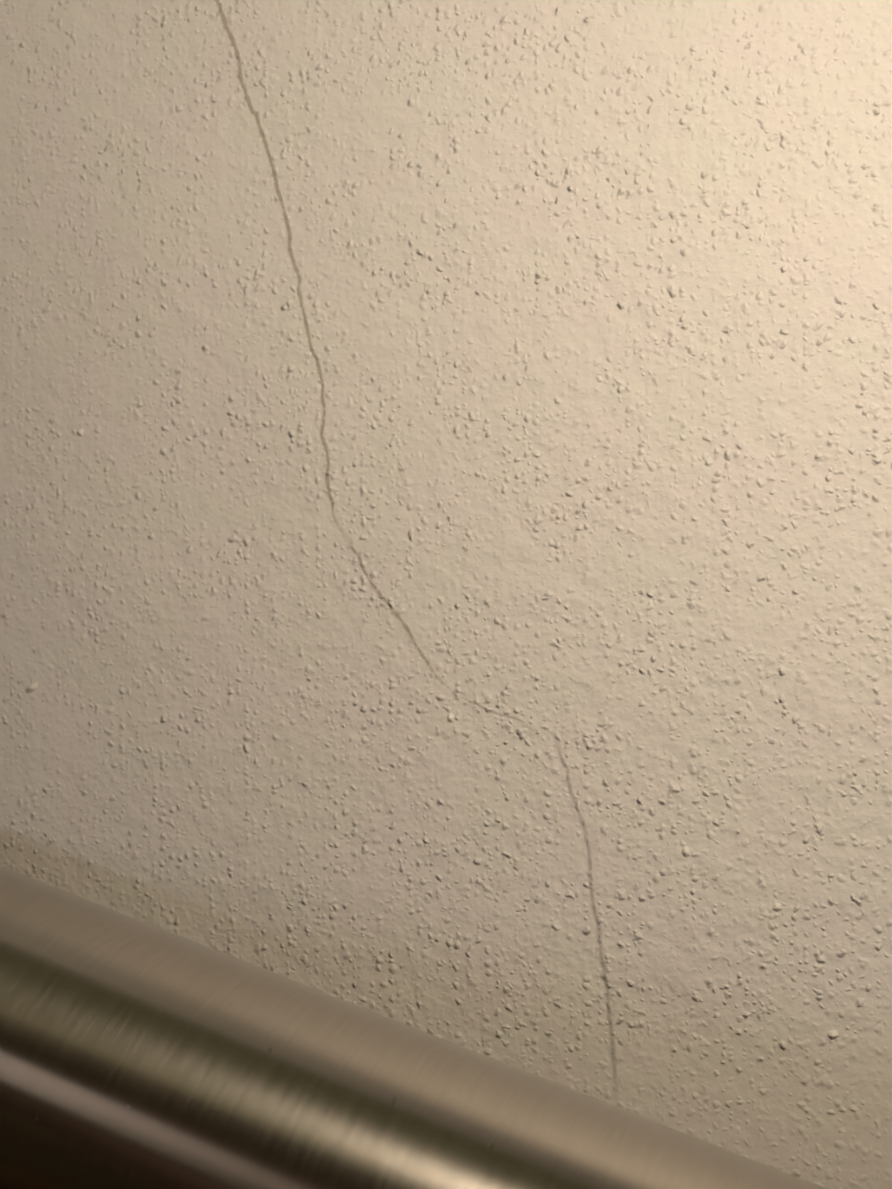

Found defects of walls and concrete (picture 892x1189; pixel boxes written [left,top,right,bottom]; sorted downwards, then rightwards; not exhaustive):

crack [216,0,332,500]
crack [359,557,416,645]